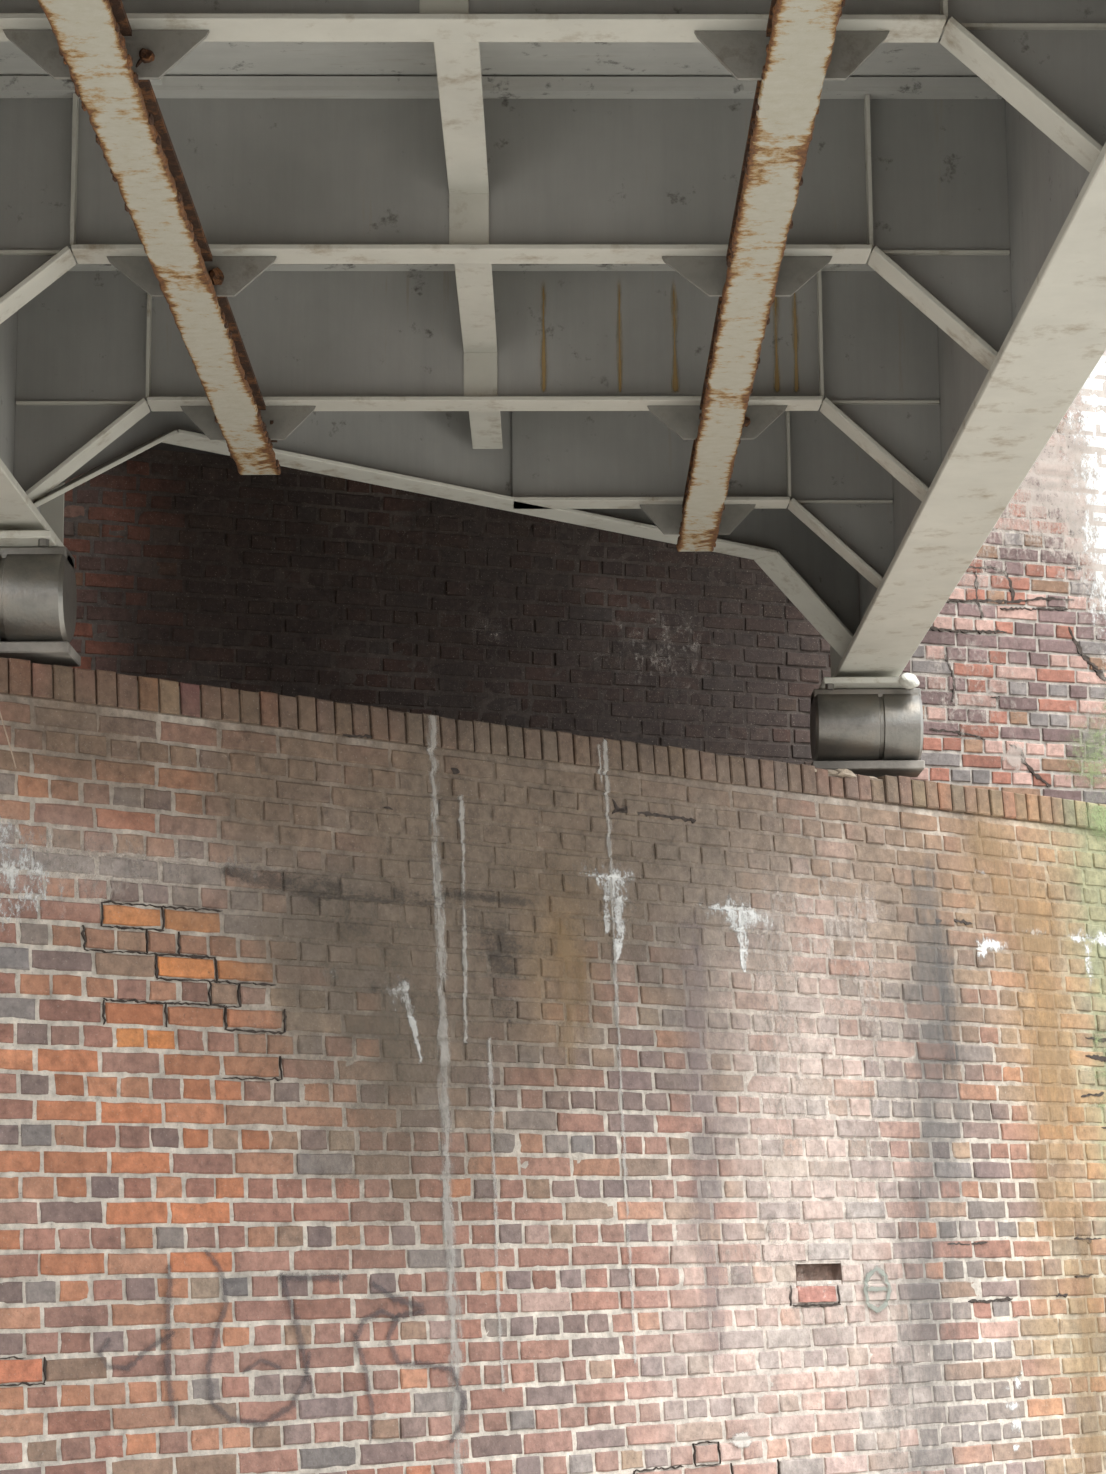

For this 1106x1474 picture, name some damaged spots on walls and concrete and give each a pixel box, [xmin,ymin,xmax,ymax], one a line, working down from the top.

corrosion [774,293,799,392]
crack [930,566,1106,787]
water stain [0,822,189,926]
crack [81,900,287,1081]
water stain [588,740,632,1212]
water stain [712,887,880,1041]
water stain [976,939,1005,956]
water stain [1071,931,1106,977]
water stain [322,715,468,1474]
water stain [487,1039,505,1390]
spalling [789,1261,842,1307]
crack [0,1356,47,1386]